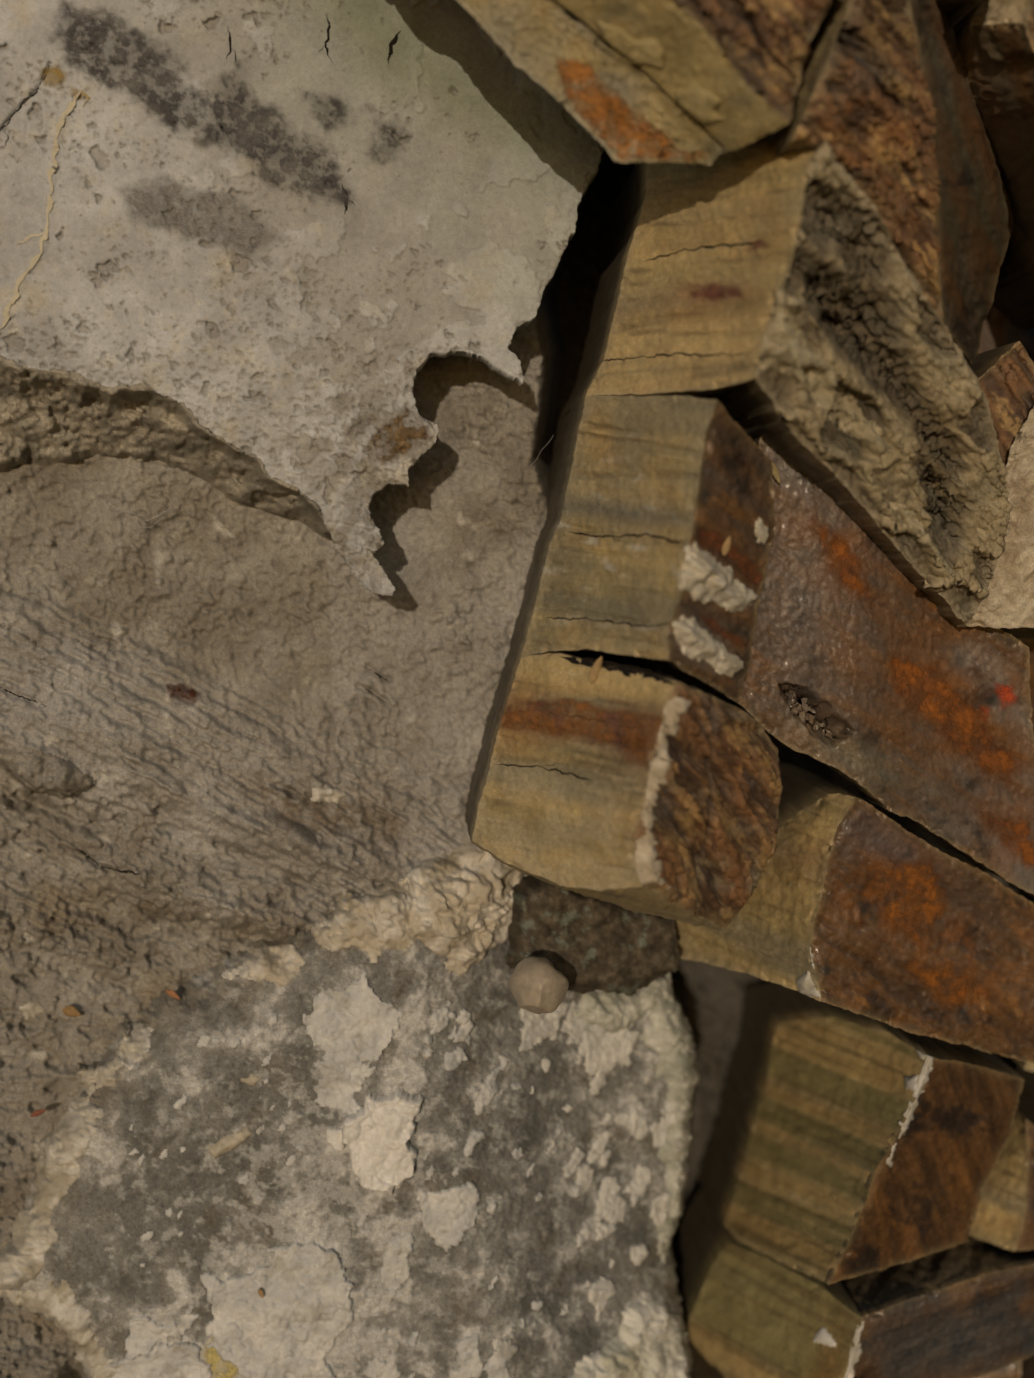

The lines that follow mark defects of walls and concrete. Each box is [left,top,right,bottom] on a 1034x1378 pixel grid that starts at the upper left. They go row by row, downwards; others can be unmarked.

crack [0,66,91,329]
spalling [0,355,333,541]
peeling [129,1147,186,1166]
peeling [173,1094,188,1110]
peeling [262,1052,273,1084]
peeling [256,1101,292,1135]
peeling [303,971,653,1304]
peeling [562,1104,678,1247]
peeling [105,1240,354,1378]
peeling [364,1327,419,1378]
peeling [449,1300,544,1378]
peeling [584,1243,648,1322]